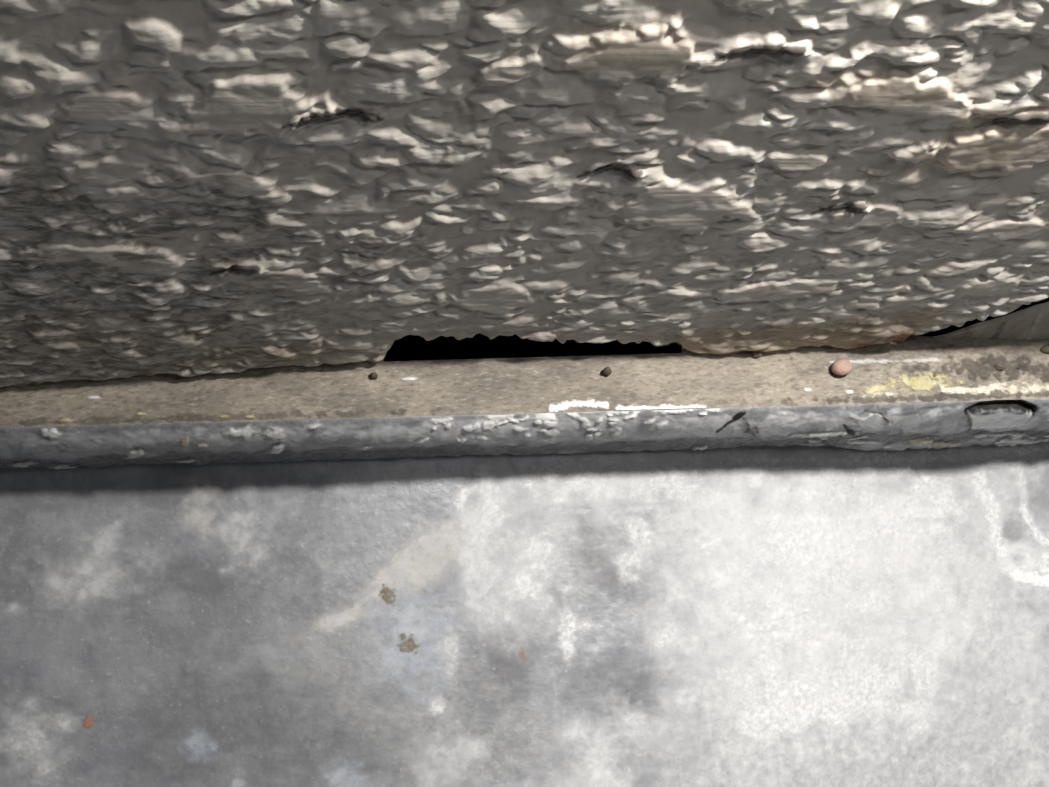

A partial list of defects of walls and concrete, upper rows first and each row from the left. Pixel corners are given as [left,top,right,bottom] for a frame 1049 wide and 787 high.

crack [715,44,806,60]
crack [282,110,383,128]
crack [975,113,1049,128]
crack [577,165,643,180]
crack [811,204,868,215]
spalling [910,297,1049,340]
hole [383,333,682,361]